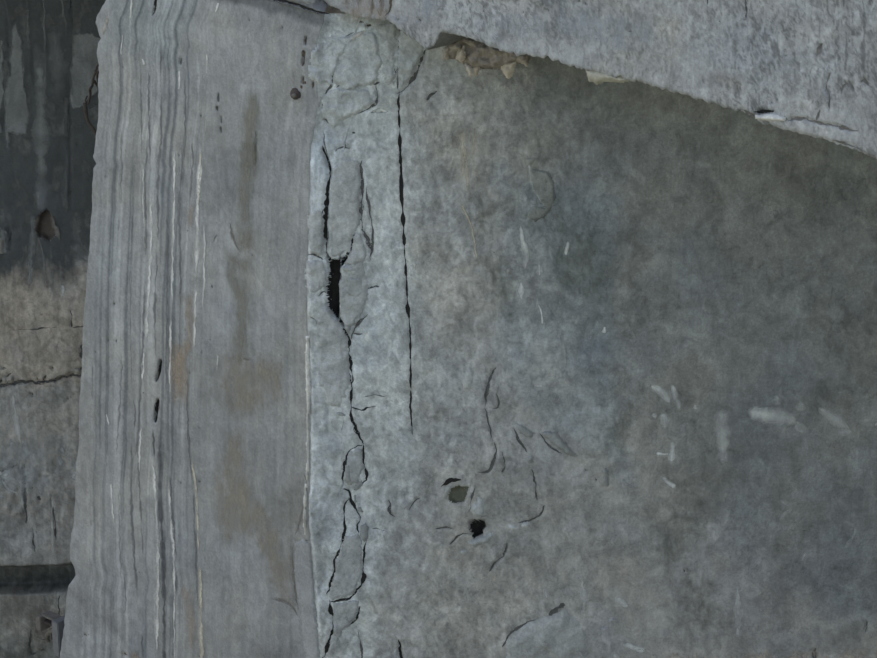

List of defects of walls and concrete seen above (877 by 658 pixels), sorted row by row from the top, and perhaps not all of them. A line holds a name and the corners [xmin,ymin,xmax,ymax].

crack [269,0,329,14]
spalling [442,37,531,79]
water stain [0,0,106,294]
crack [213,224,241,252]
crack [302,0,437,658]
crack [273,475,308,616]